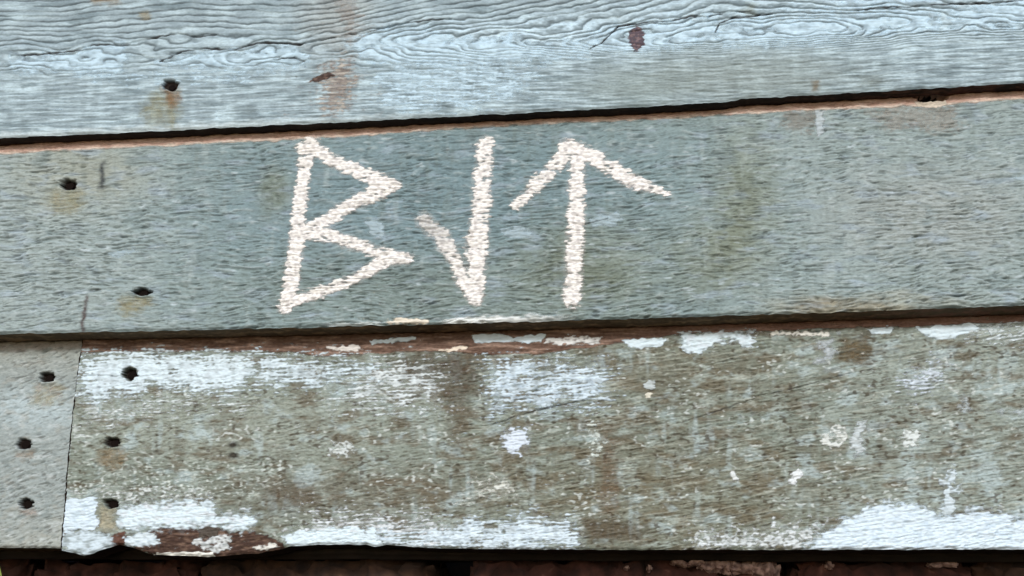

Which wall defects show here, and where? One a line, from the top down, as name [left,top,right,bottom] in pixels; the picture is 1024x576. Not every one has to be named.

peeling [622,338,667,349]
peeling [678,330,758,354]
peeling [770,330,834,363]
peeling [868,325,894,334]
peeling [915,322,1024,348]
peeling [72,314,626,464]
peeling [643,380,655,398]
peeling [895,351,943,395]
peeling [820,421,867,455]
peeling [901,430,921,450]
peeling [62,473,580,557]
peeling [694,464,1024,550]